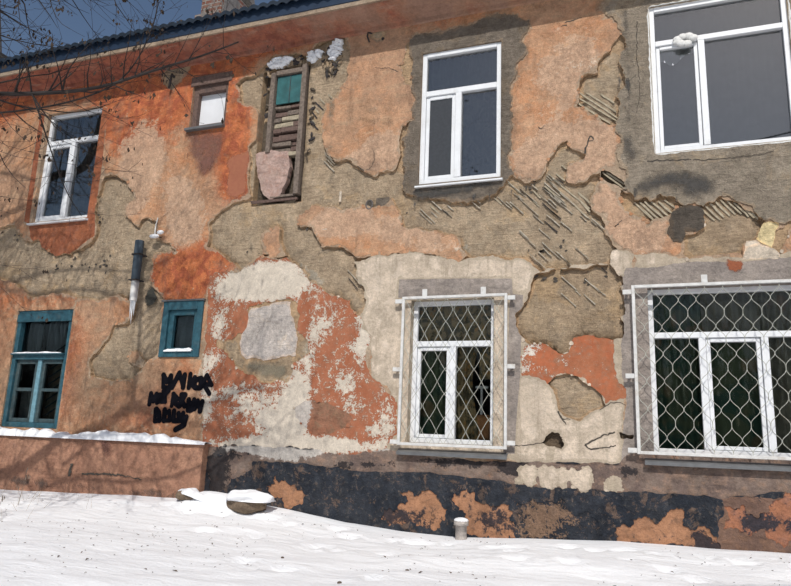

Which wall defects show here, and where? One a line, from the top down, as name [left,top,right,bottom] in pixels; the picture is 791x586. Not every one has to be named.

crack [647,151,772,162]
water stain [634,172,711,196]
flaking render [200,33,684,492]
flaking render [0,174,175,382]
crack [584,431,616,450]